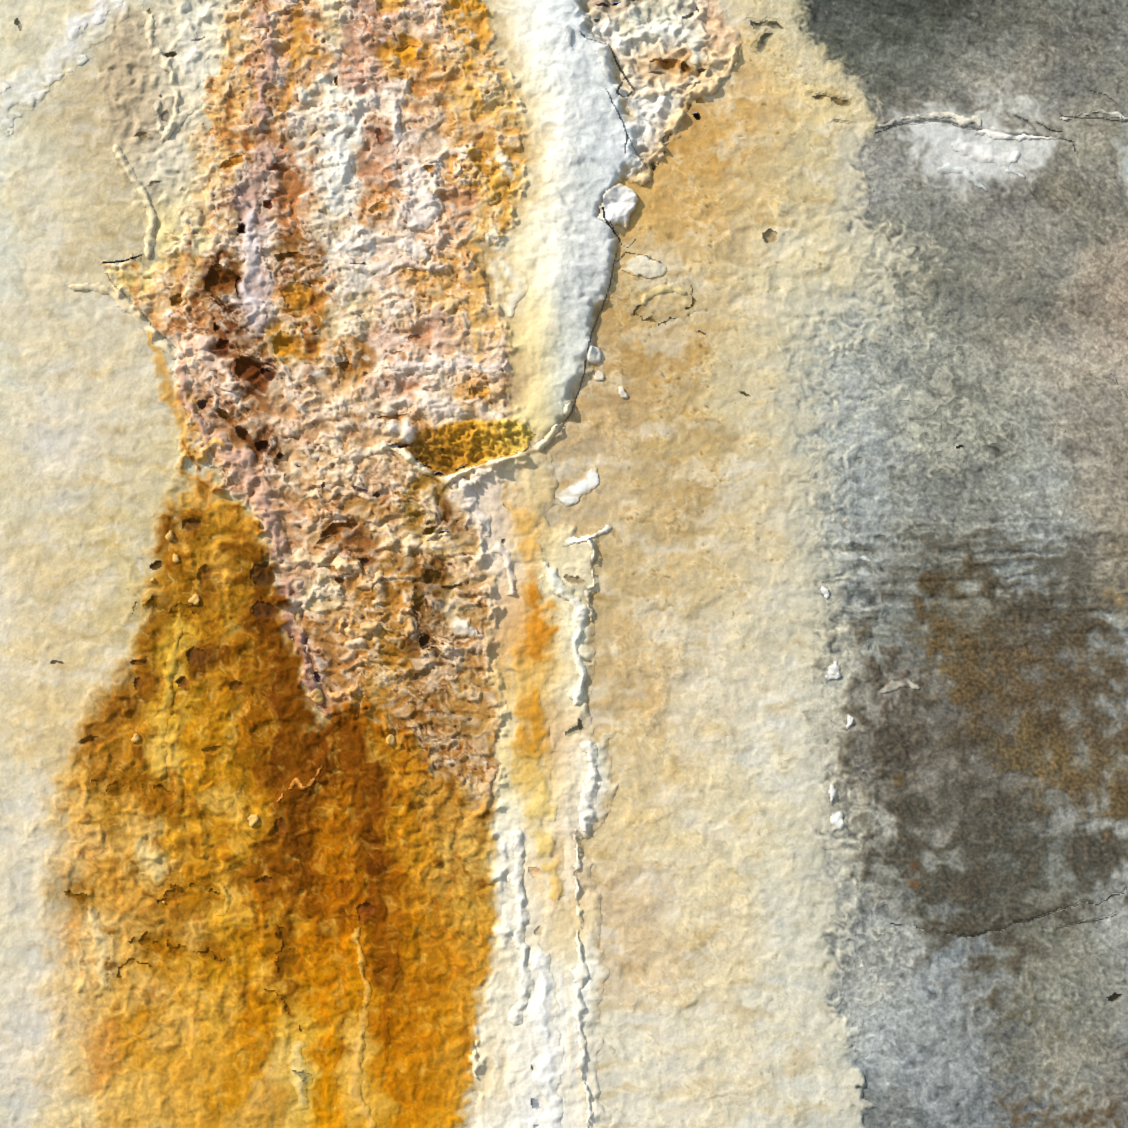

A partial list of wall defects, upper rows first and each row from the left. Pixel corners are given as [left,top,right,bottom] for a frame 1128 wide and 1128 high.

corrosion [13,330,496,1128]
spalling [95,0,531,799]
corrosion [497,480,566,908]
leakage [746,0,1128,365]
leakage [793,346,1128,1128]
crack [1068,90,1128,122]